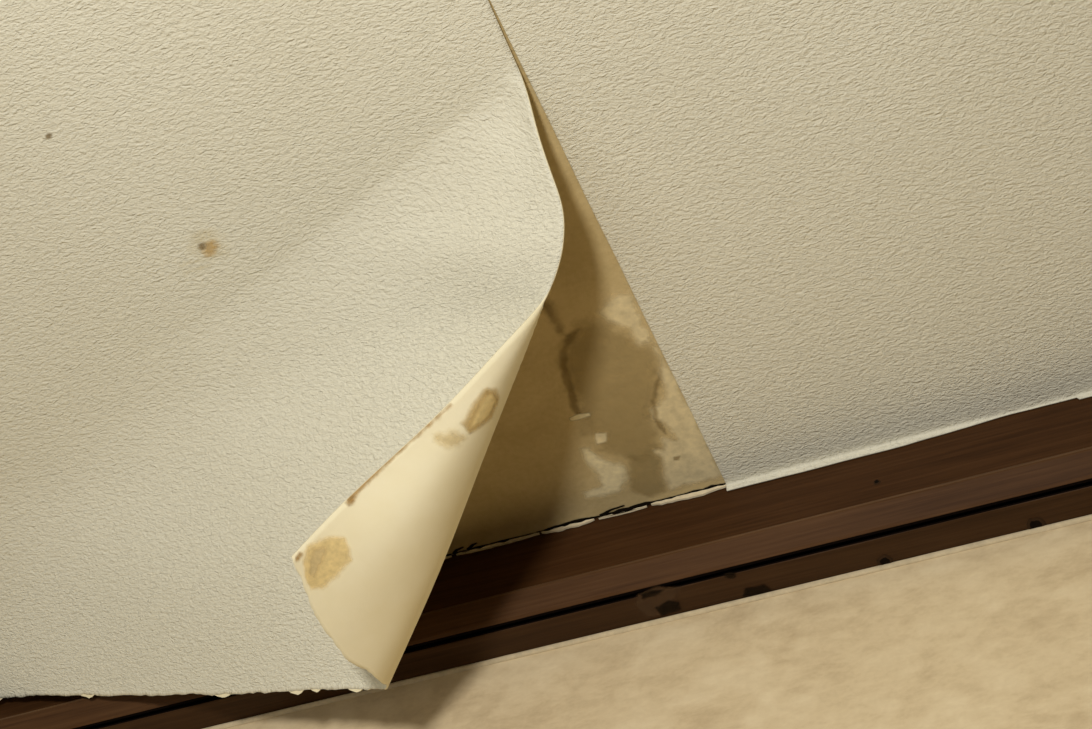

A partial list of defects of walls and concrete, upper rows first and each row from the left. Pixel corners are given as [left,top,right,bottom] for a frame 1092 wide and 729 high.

spalling [637,587,681,616]